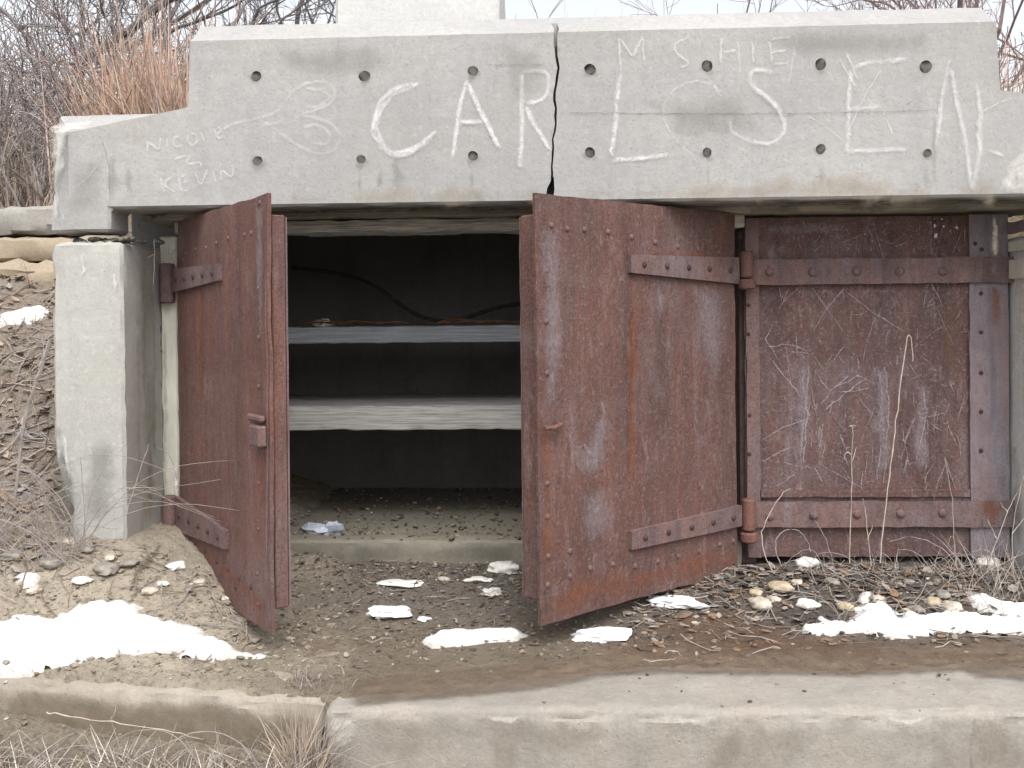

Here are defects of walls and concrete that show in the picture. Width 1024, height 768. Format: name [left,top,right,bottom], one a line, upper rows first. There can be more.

crack [490,47,851,180]